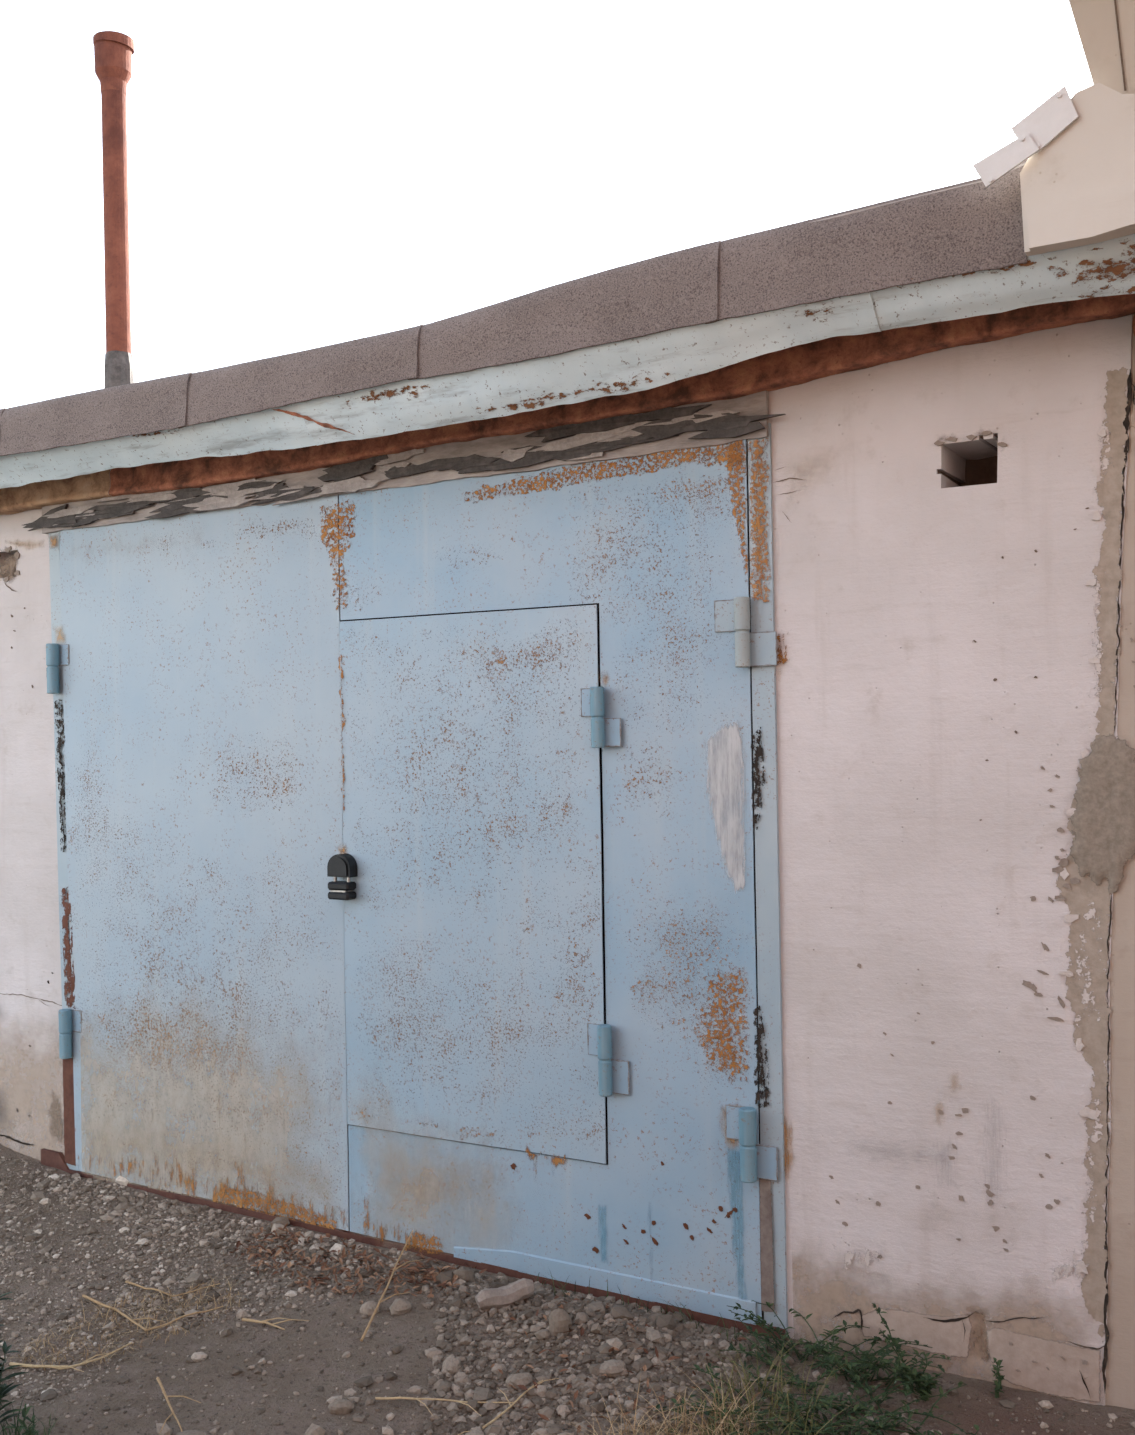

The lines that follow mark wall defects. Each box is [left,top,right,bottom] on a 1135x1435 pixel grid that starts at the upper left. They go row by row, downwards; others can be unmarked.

peeling [23,404,786,531]
spalling [0,546,21,582]
corrosion [240,500,382,610]
corrosion [617,742,684,816]
peeling [1022,367,1135,1342]
corrosion [69,619,605,1254]
corrosion [628,897,752,1095]
crack [923,894,1112,1399]
crack [832,1309,863,1329]